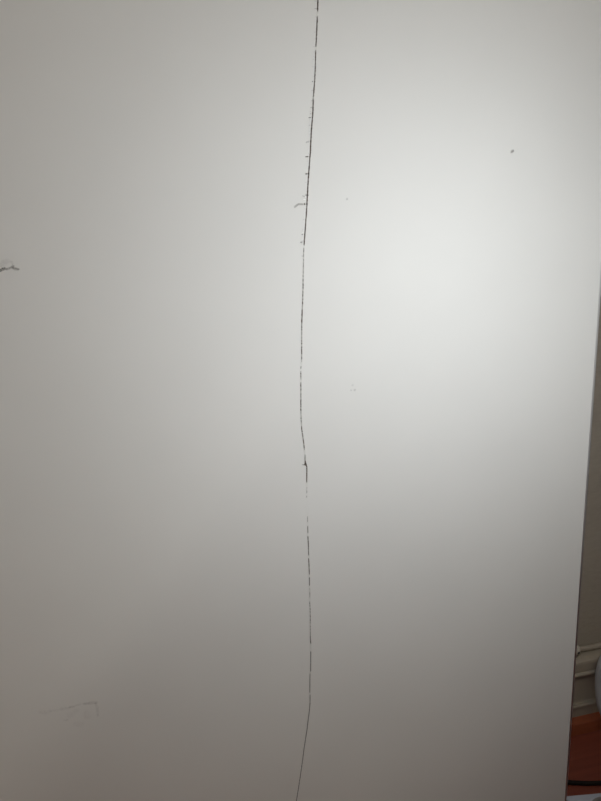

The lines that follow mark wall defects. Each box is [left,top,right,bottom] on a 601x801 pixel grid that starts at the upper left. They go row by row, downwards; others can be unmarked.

crack [300,0,318,482]